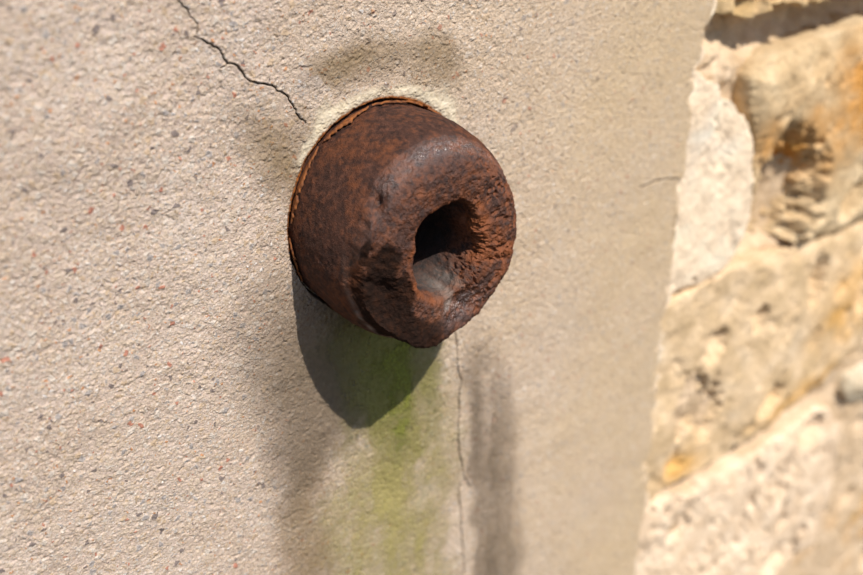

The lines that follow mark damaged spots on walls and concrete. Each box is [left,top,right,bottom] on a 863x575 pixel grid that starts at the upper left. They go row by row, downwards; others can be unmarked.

crack [178,0,306,123]
corrosion [287,95,442,282]
damp [266,320,445,575]